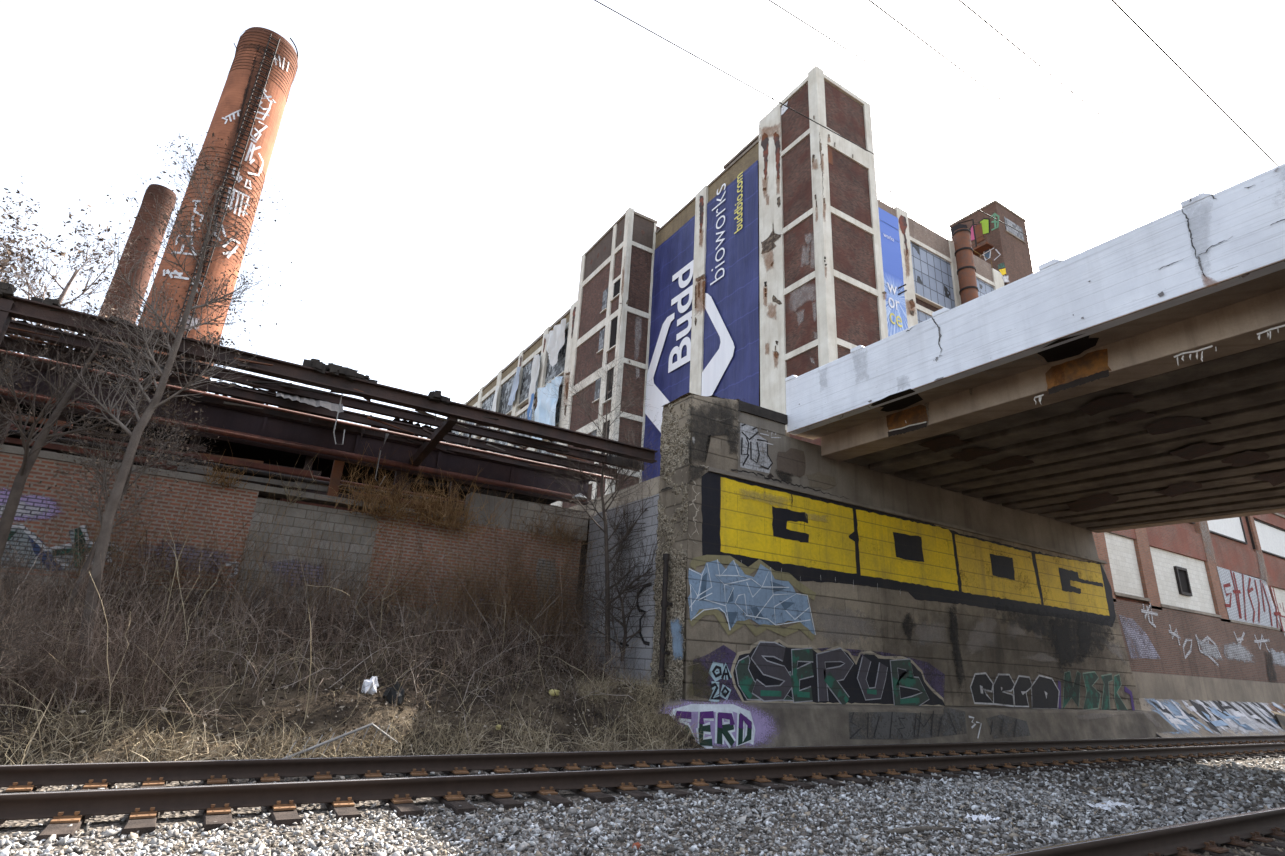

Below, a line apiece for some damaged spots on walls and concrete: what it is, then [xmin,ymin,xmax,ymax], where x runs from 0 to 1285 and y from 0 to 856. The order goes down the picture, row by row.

crack [1160,185,1253,283]
crack [906,318,942,360]
spalling [1038,314,1099,362]
spalling [868,389,923,412]